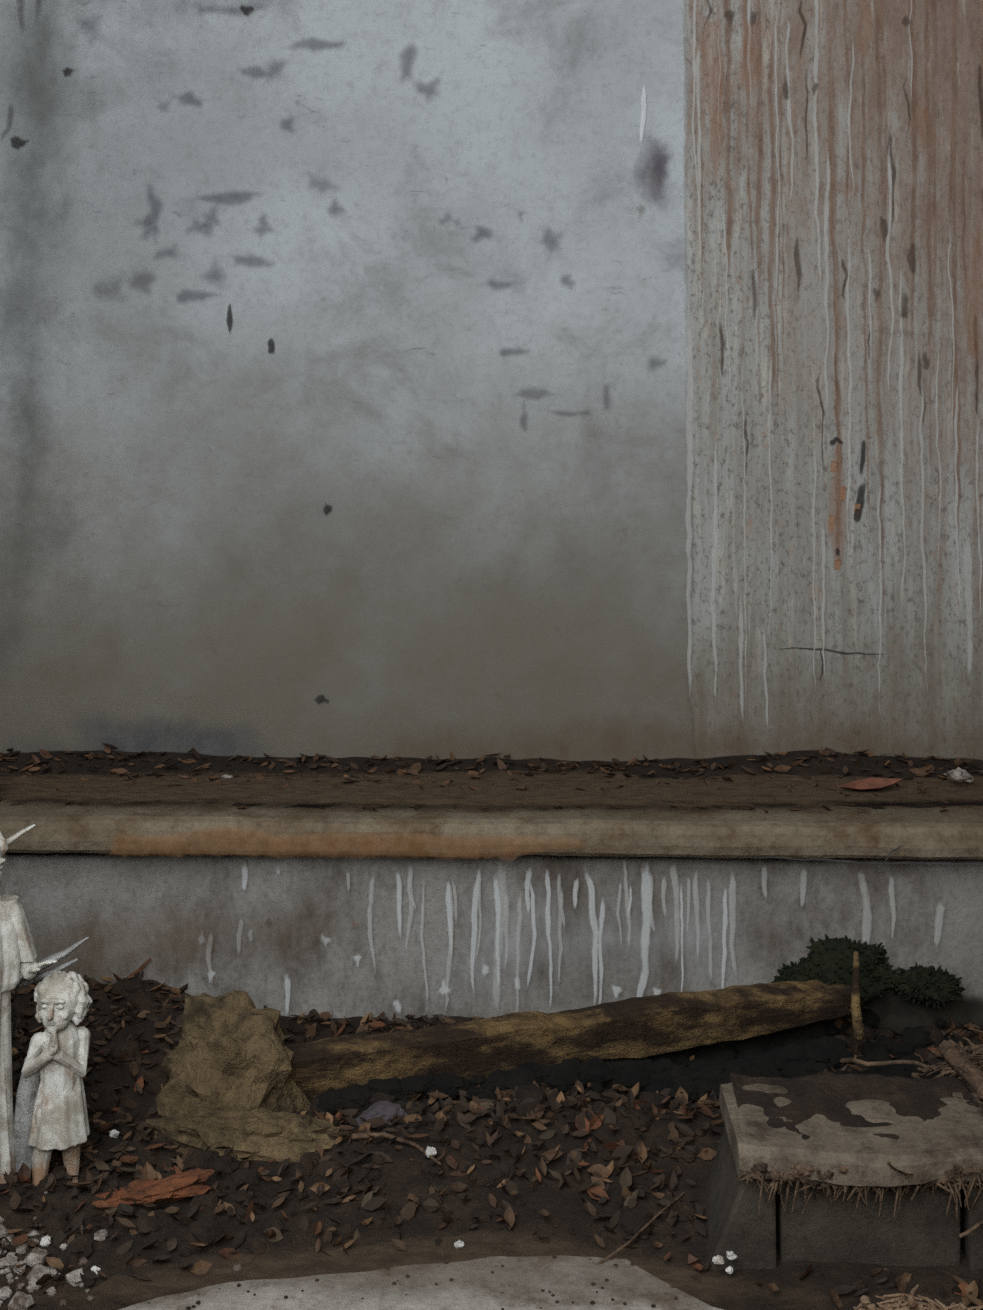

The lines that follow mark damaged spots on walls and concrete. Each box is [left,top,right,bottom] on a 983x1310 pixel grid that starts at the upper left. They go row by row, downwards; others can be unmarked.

corrosion [685,0,983,759]
efflorescence [471,874,500,985]
efflorescence [516,872,552,997]
efflorescence [573,879,620,1001]
efflorescence [628,872,660,997]